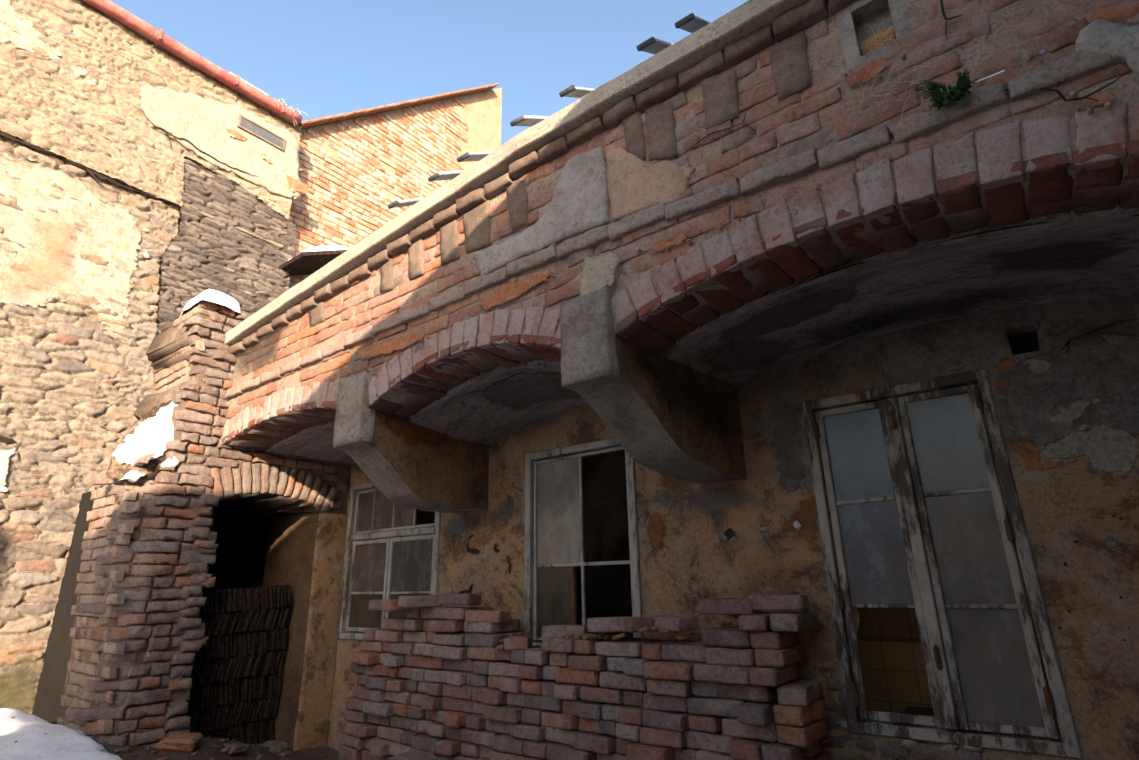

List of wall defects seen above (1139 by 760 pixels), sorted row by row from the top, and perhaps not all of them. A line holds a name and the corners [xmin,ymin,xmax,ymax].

flaking render [1076,19,1139,77]
crack [0,131,166,200]
flaking render [140,85,311,200]
flaking render [0,152,149,338]
spalling [476,268,556,310]
flaking render [472,145,696,276]
flaking render [0,448,15,492]
flaking render [1017,398,1139,486]